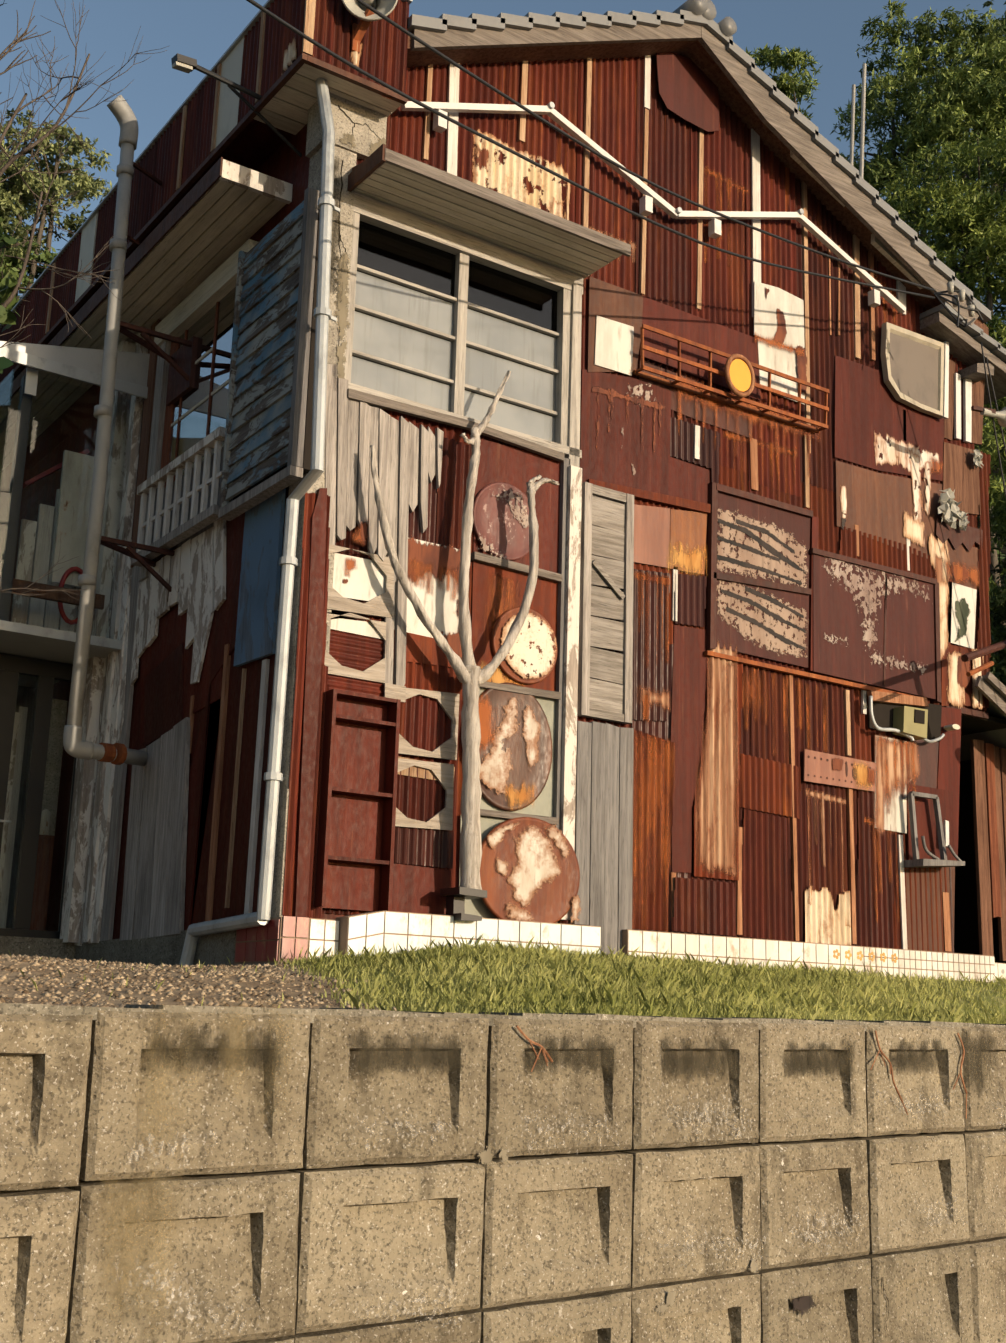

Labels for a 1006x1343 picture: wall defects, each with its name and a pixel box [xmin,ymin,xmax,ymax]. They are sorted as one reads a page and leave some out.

peeling [472,129,571,220]
rust [407,537,462,658]
peeling [501,613,557,679]
peeling [695,431,978,877]
peeling [478,697,541,806]
rust [740,665,920,923]
peeling [487,822,569,922]
peeling [571,895,581,923]
peeling [805,886,851,945]